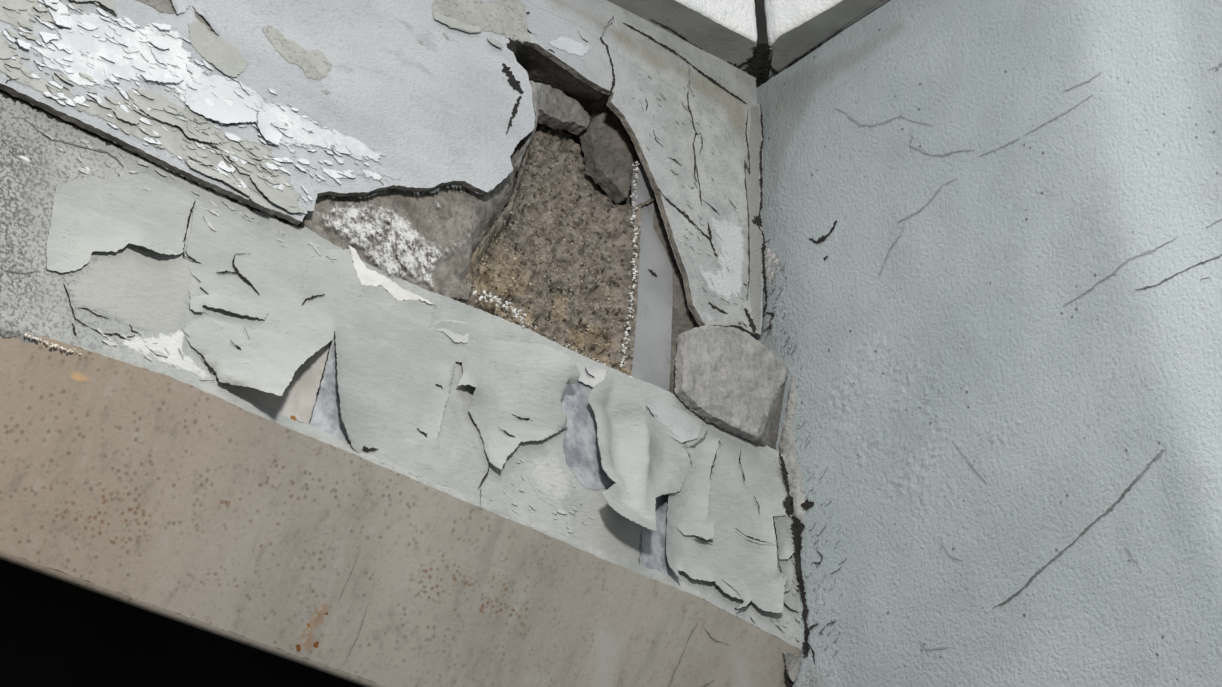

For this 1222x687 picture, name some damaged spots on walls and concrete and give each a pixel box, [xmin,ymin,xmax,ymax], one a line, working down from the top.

crack [502,12,555,135]
crack [579,16,842,333]
crack [835,72,1101,277]
peeling [0,0,847,687]
crack [1063,237,1222,306]
crack [993,449,1166,608]
corrosion [295,601,335,657]